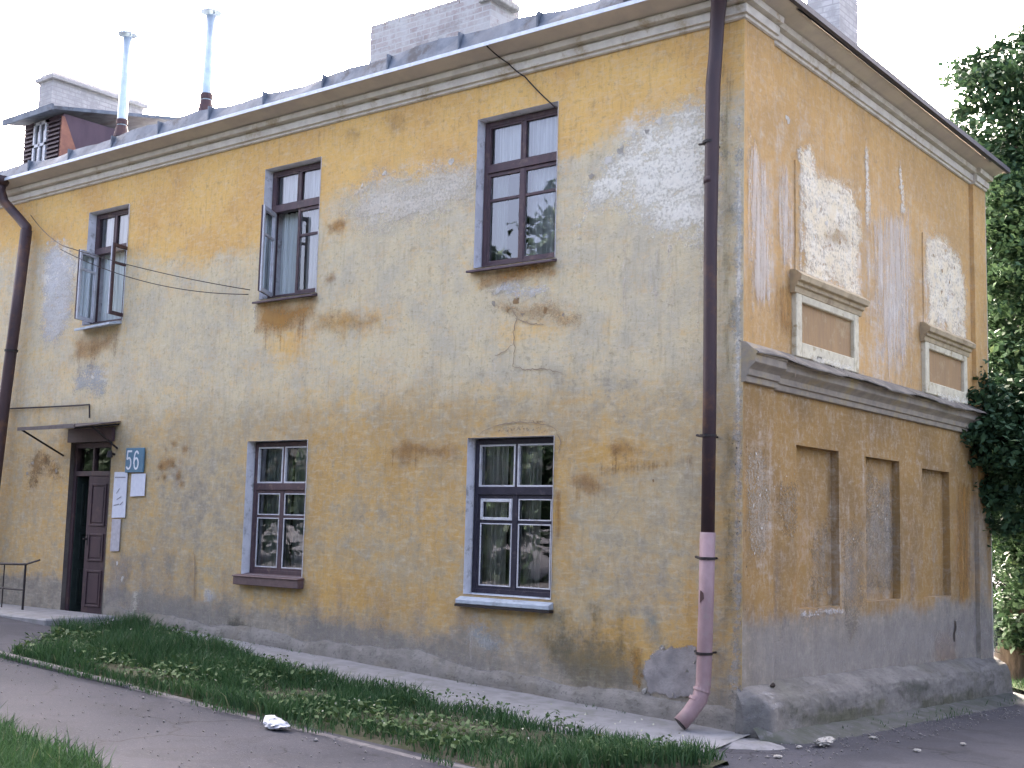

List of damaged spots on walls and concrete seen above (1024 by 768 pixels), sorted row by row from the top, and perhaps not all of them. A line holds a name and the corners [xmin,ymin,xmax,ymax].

crack [495,302,562,373]
peeling [575,104,705,246]
peeling [780,145,862,294]
peeling [925,236,967,338]